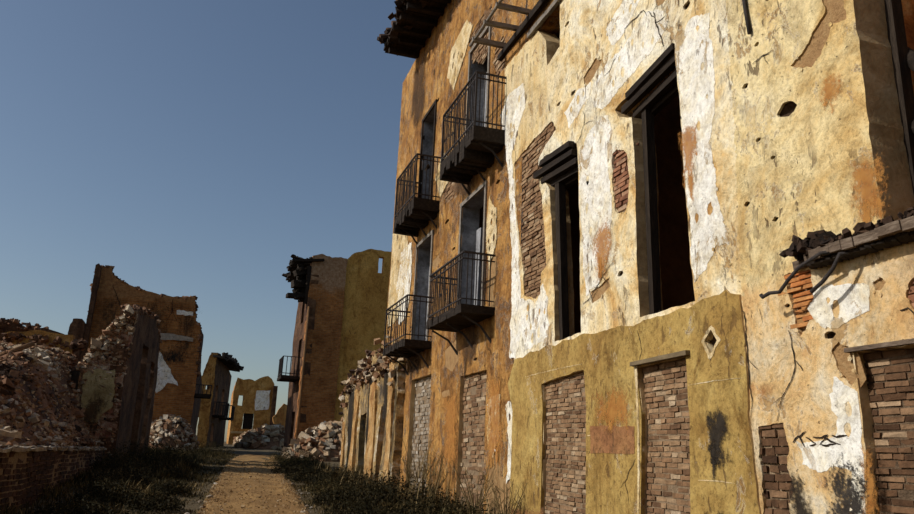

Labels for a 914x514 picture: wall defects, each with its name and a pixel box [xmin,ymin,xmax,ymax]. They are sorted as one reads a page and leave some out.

spalling [793,0,847,72]
peeling [564,0,668,303]
peeling [675,13,729,282]
peeling [486,196,498,310]
spalling [491,83,556,359]
damp [705,411,731,479]
crack [743,311,757,426]
crack [774,330,803,421]
peeling [759,269,886,514]